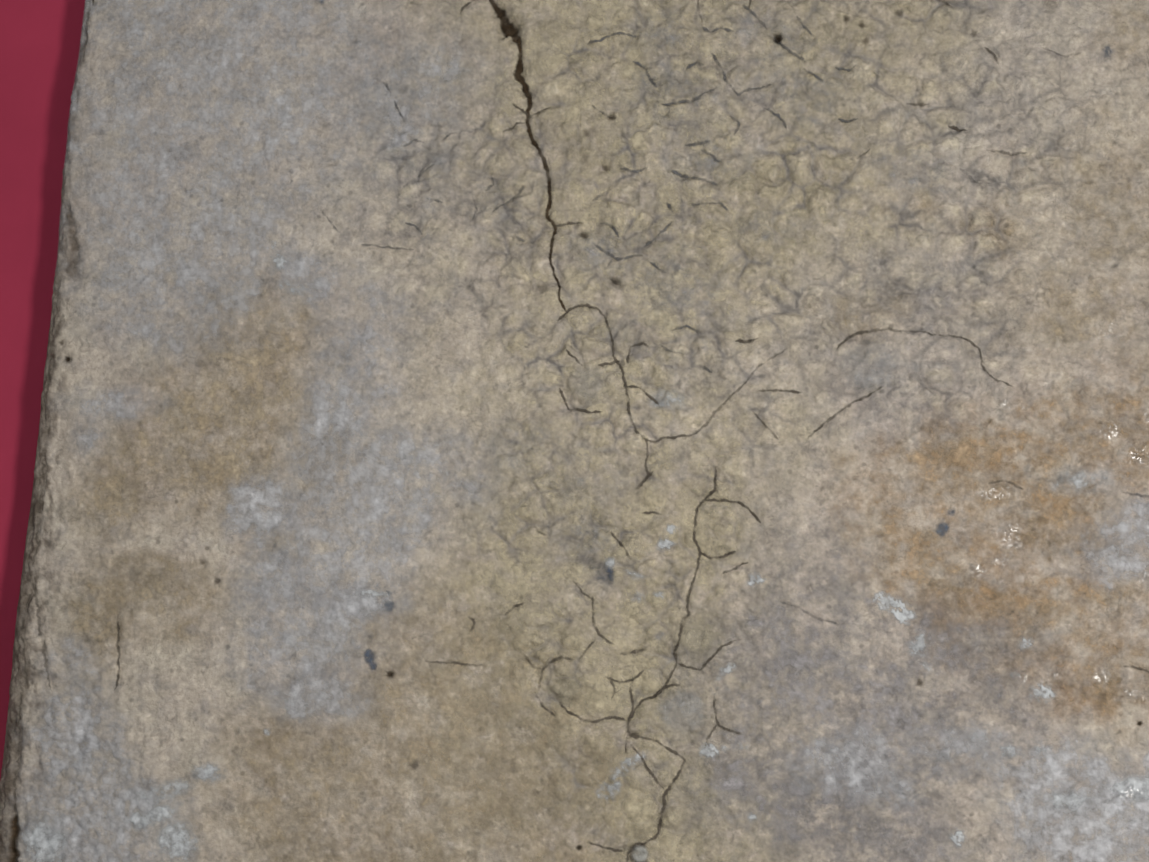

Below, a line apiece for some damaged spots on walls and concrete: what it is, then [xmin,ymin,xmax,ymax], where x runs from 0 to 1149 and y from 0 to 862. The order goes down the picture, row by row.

crack [590,0,786,132]
crack [775,25,851,81]
crack [596,141,727,283]
crack [461,0,699,514]
crack [839,331,868,346]
crack [912,331,1009,385]
crack [725,383,800,424]
crack [814,387,881,432]
crack [527,470,760,860]